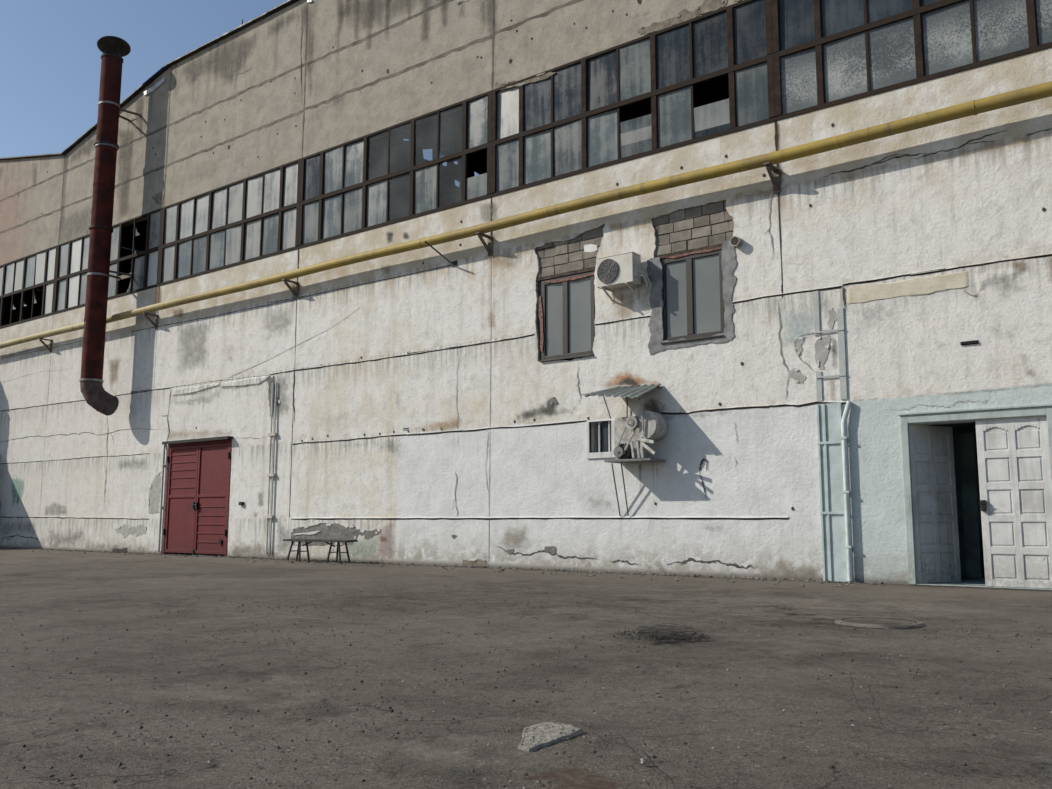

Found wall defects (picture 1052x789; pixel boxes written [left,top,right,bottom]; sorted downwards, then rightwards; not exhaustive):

crack [824,131,1002,177]
peeling [793,308,837,370]
corrosion [613,374,644,386]
peeling [788,368,806,384]
flaking render [291,523,381,546]
crack [496,546,636,565]
crack [671,558,756,568]